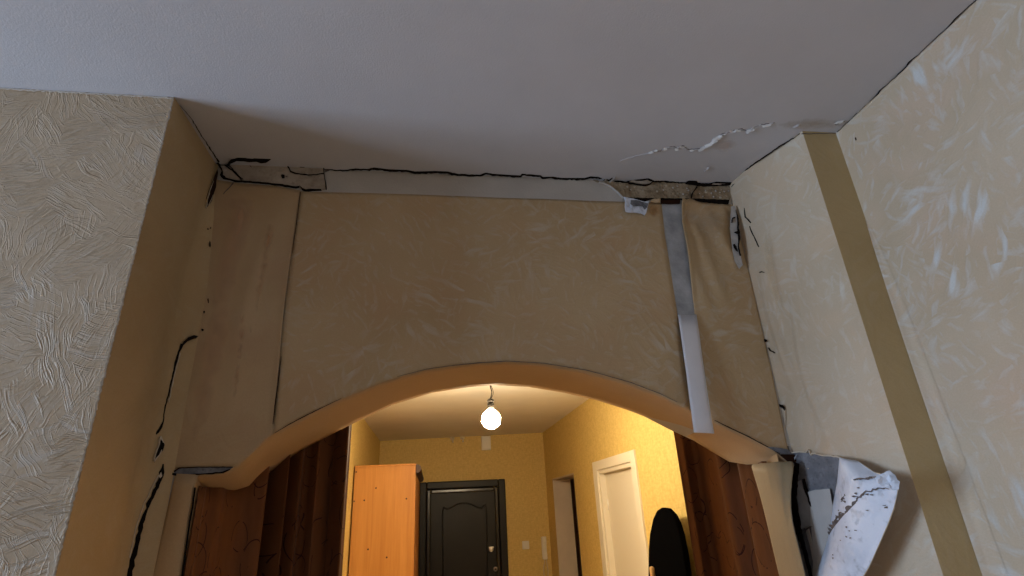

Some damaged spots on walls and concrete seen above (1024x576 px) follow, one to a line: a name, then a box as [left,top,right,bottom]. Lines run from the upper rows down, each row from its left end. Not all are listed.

crack [327,0,976,187]
peeling [621,122,775,161]
flaking render [593,179,731,320]
crack [156,329,204,434]
crack [127,464,231,576]
flaking render [768,447,839,576]